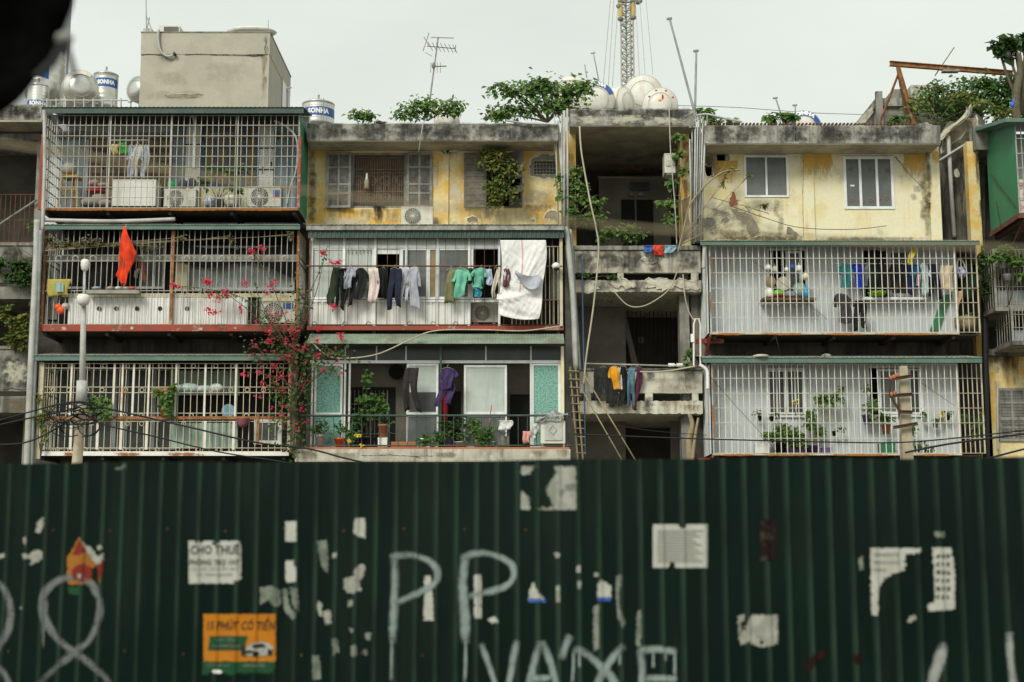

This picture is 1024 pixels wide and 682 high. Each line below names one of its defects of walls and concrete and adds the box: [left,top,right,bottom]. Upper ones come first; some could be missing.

damp [316,124,380,137]
damp [436,124,508,151]
damp [522,124,549,138]
damp [715,126,757,141]
damp [866,127,921,140]
damp [922,153,931,235]
damp [579,251,661,270]